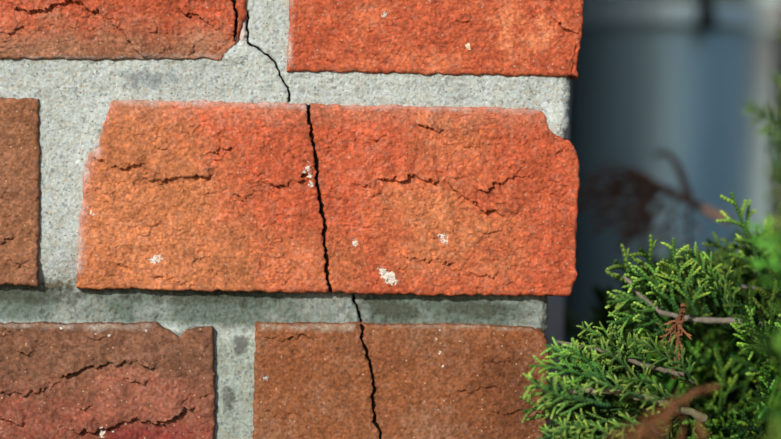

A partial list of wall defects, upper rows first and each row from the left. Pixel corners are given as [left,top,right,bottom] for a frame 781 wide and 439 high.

crack [231,0,332,293]
crack [352,295,382,439]